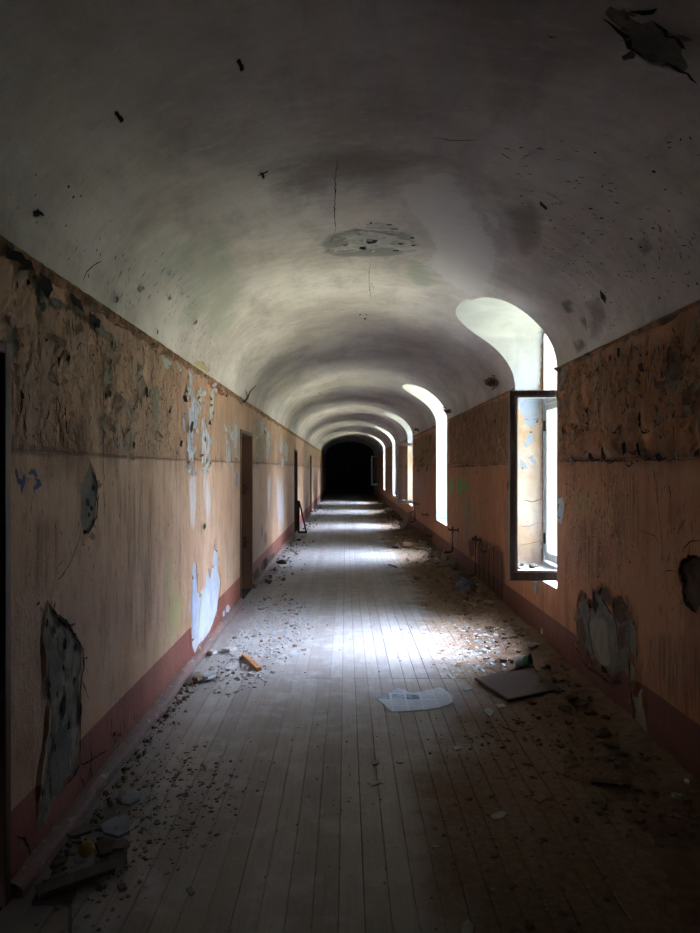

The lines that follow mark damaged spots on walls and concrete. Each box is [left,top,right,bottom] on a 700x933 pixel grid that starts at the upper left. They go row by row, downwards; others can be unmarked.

spalling [598,3,700,84]
crack [330,163,338,242]
spalling [0,235,320,478]
spalling [554,300,700,415]
spalling [55,457,113,568]
peeling [189,539,230,657]
spalling [574,581,643,697]
spalling [676,549,700,616]
spalling [36,595,89,835]